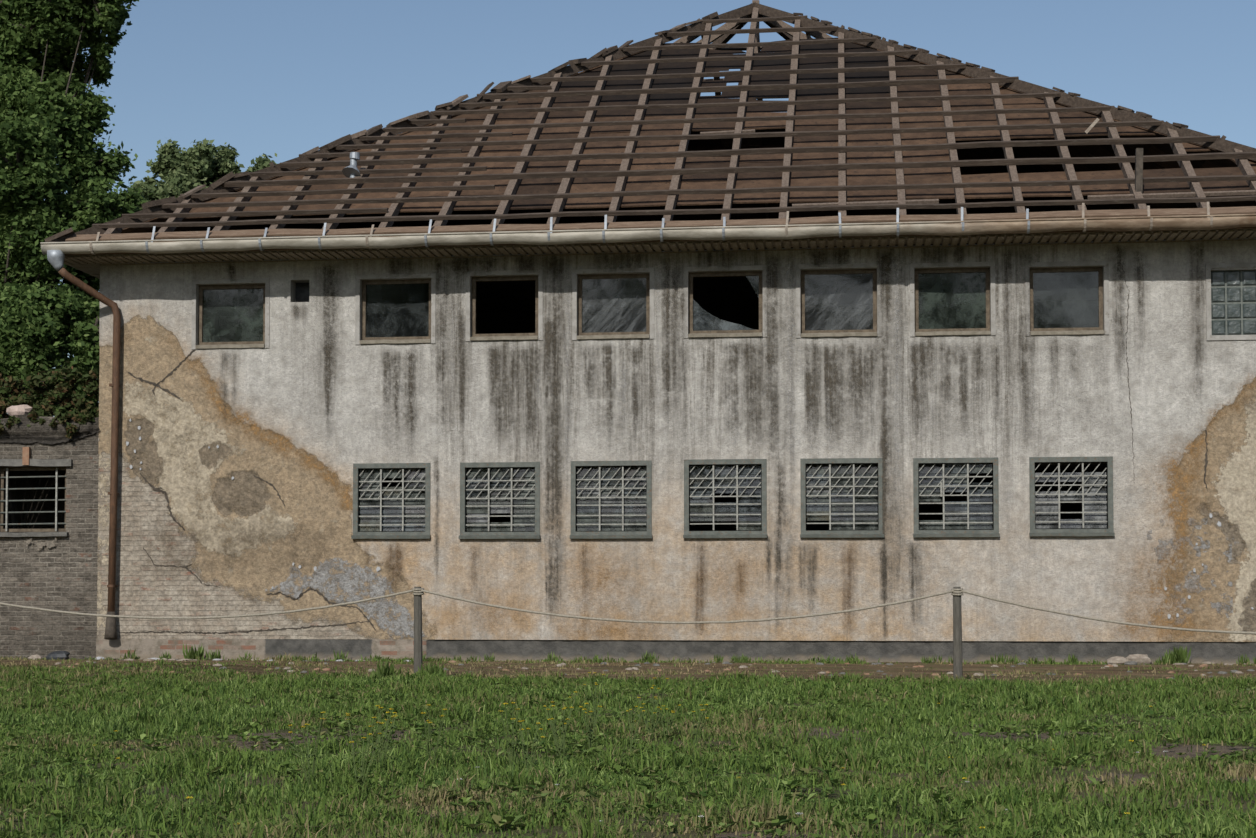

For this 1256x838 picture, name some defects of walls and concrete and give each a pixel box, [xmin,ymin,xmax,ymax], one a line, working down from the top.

crack [128,349,195,401]
leakage [384,354,414,429]
leakage [585,347,612,419]
leakage [910,345,925,416]
leakage [941,347,998,409]
crack [140,473,185,530]
spalling [0,315,437,640]
leakage [490,295,562,606]
leakage [767,467,815,590]
leakage [805,255,916,629]
spalling [1147,377,1256,642]
crack [143,547,220,588]